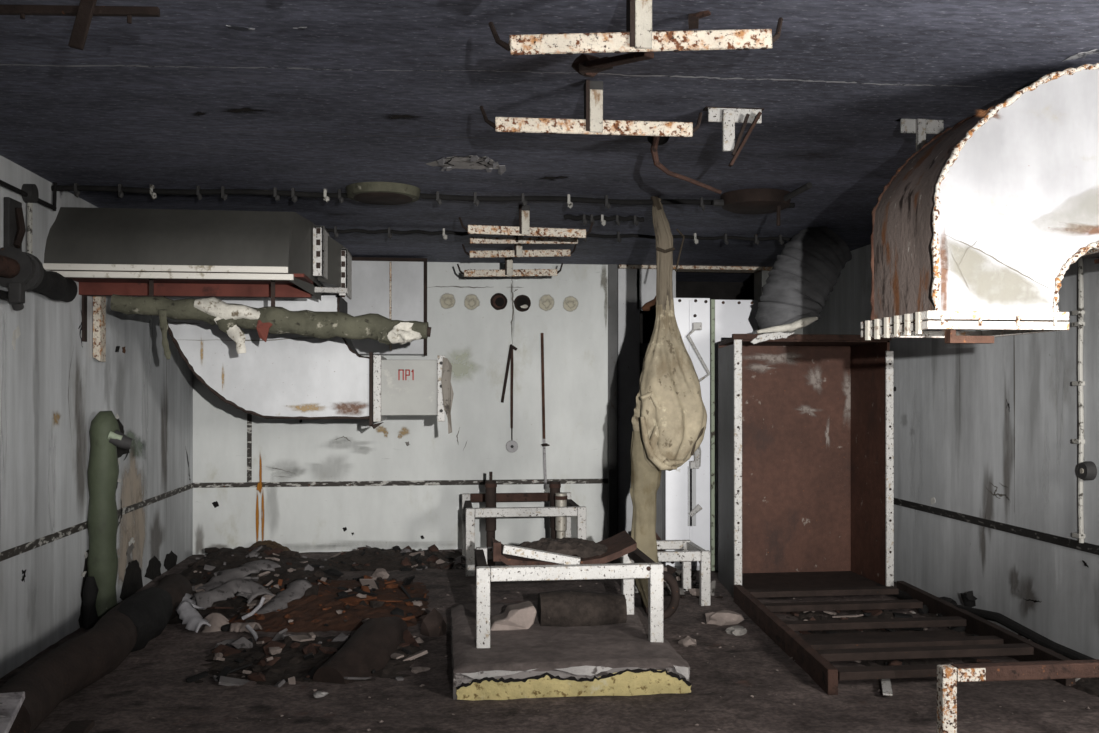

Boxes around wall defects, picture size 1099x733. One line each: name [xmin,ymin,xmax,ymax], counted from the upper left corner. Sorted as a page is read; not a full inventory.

corrosion [337,403,365,414]
corrosion [256,457,264,542]